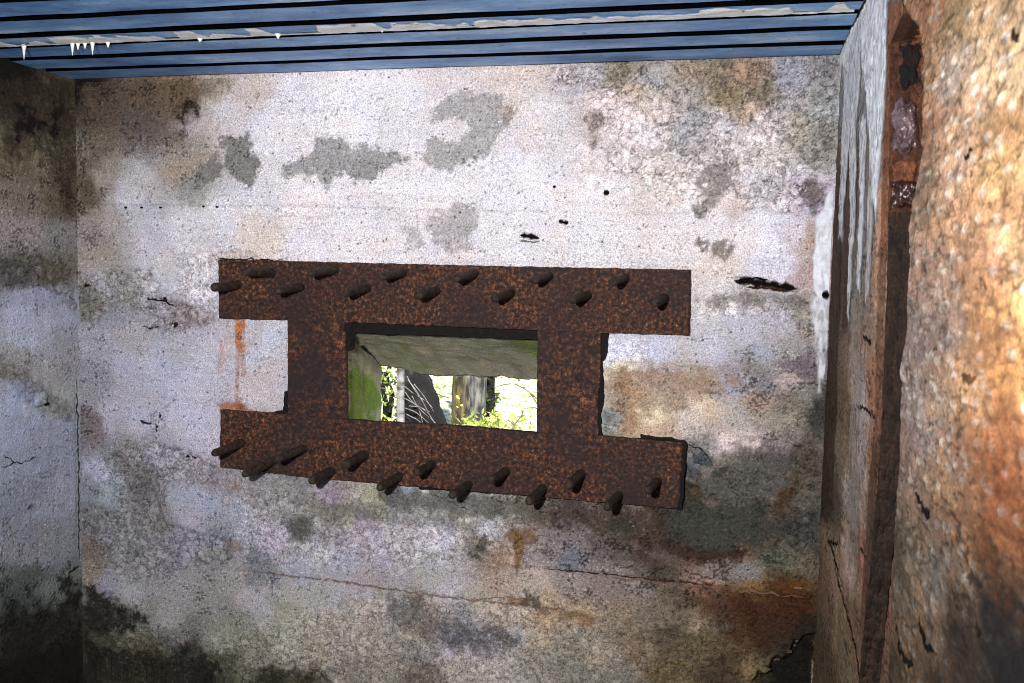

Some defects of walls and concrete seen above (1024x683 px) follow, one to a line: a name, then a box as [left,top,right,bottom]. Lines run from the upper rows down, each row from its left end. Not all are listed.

water stain [0,0,887,380]
rust [235,319,245,352]
rust [860,0,924,630]
rust [219,403,252,411]
rust [605,369,739,433]
rust [513,532,523,573]
crack [828,540,866,677]
spalling [754,633,814,683]